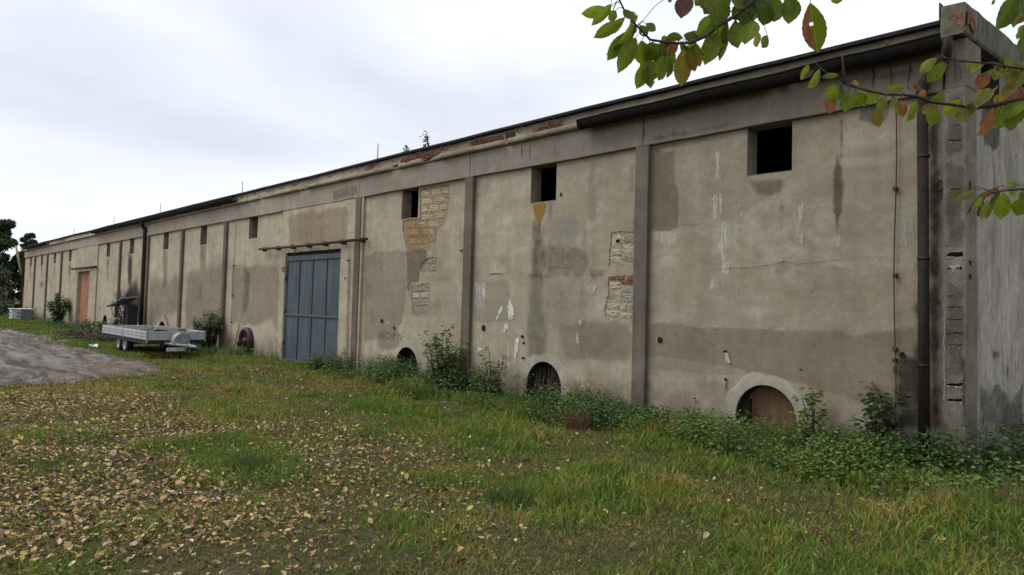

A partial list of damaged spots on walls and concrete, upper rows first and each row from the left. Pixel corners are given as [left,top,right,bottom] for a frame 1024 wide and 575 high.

spalling [400,146,442,163]
spalling [403,184,451,316]
rust [533,202,545,233]
spalling [605,231,634,321]
water stain [834,165,842,219]
peeling [474,279,525,359]